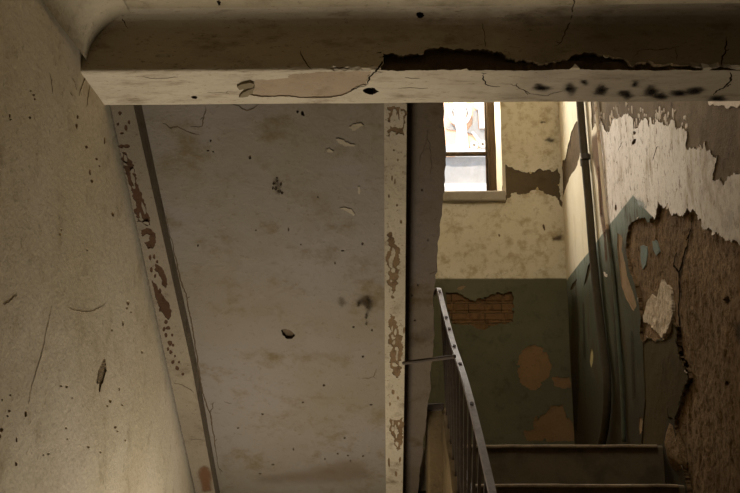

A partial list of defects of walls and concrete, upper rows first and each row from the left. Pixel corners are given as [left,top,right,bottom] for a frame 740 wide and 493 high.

peeling [237,71,371,98]
crack [351,52,385,90]
spalling [381,47,740,71]
peeling [387,106,408,136]
flaking render [502,121,580,207]
flaking render [591,101,740,185]
peeling [118,144,184,376]
peeling [385,232,400,299]
flaking render [446,285,514,330]
peeling [388,314,405,378]
peeling [517,344,572,390]
spalling [617,202,740,493]